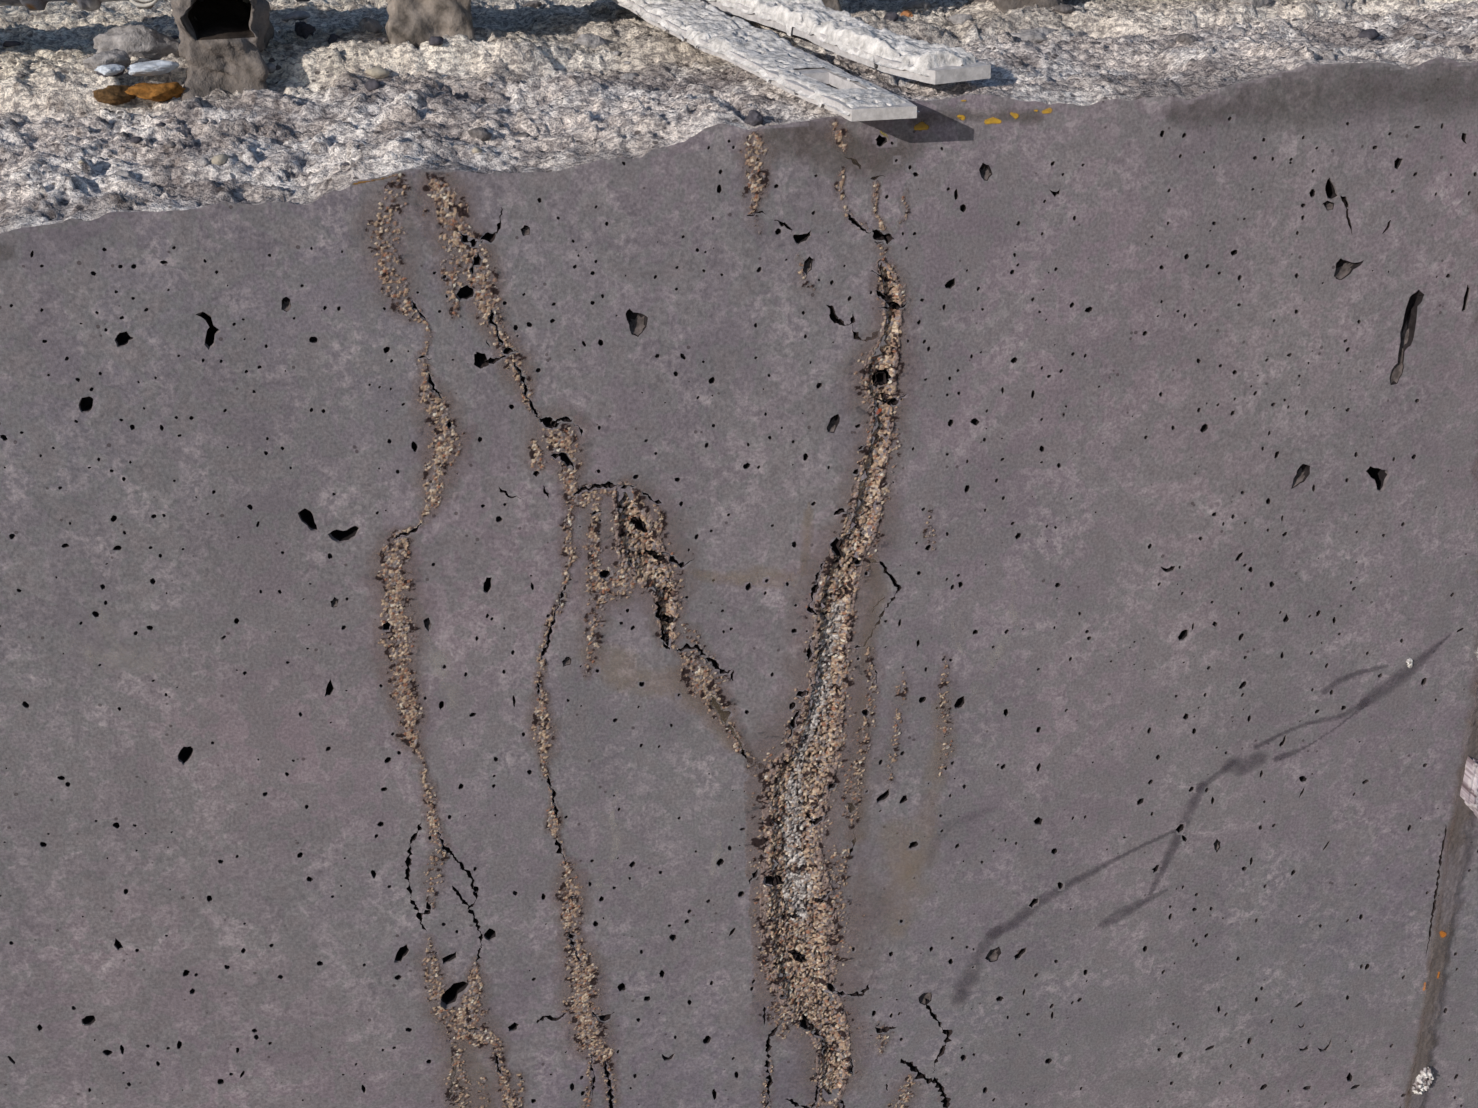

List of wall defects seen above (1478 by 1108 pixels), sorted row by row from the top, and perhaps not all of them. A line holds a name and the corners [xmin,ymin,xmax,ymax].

peeling [94,60,180,76]
crack [1426,827,1447,953]